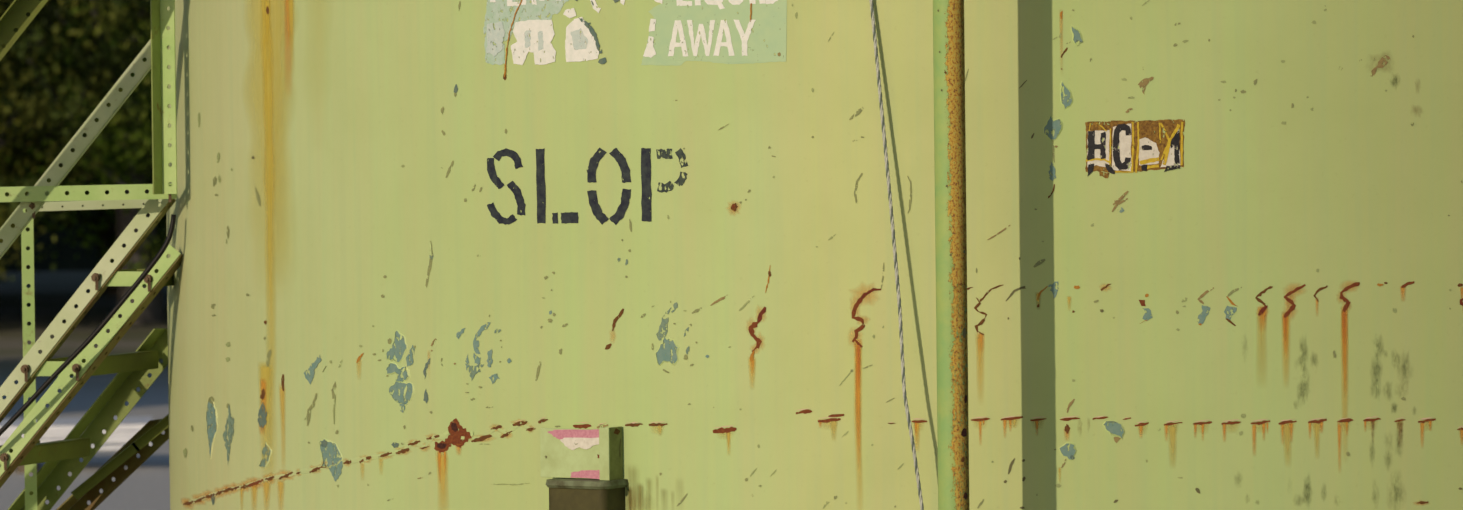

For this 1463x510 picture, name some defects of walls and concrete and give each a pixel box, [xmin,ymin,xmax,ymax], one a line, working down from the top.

peeling [1053,9,1092,61]
corrosion [253,0,292,262]
corrosion [944,0,1436,510]
peeling [641,301,709,373]
peeling [373,315,511,448]
peeling [183,396,234,464]
peeling [258,403,272,468]
peeling [304,355,343,487]
corrosion [183,417,668,505]
corrosion [796,408,844,432]
corrosion [888,418,927,438]